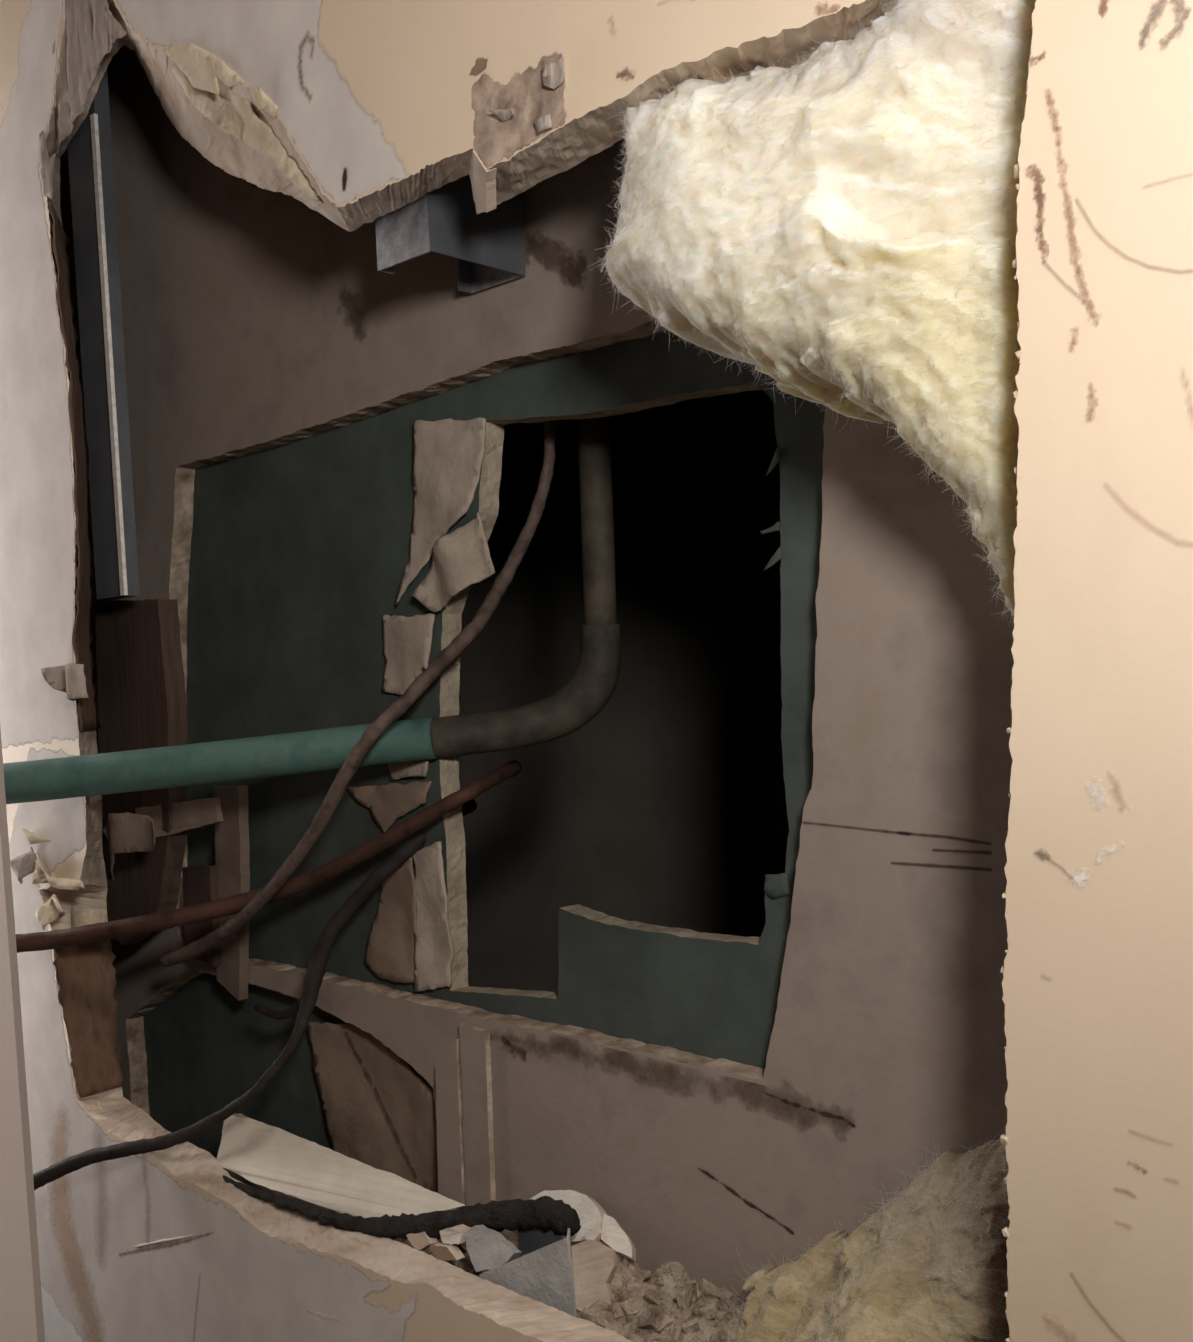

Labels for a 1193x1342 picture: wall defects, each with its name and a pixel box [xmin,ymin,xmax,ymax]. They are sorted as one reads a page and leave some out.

peeling [117,0,408,204]
peeling [0,0,89,761]
peeling [9,797,86,934]
peeling [17,950,417,1342]
flaking render [406,1224,522,1272]
flaking render [530,1190,636,1311]